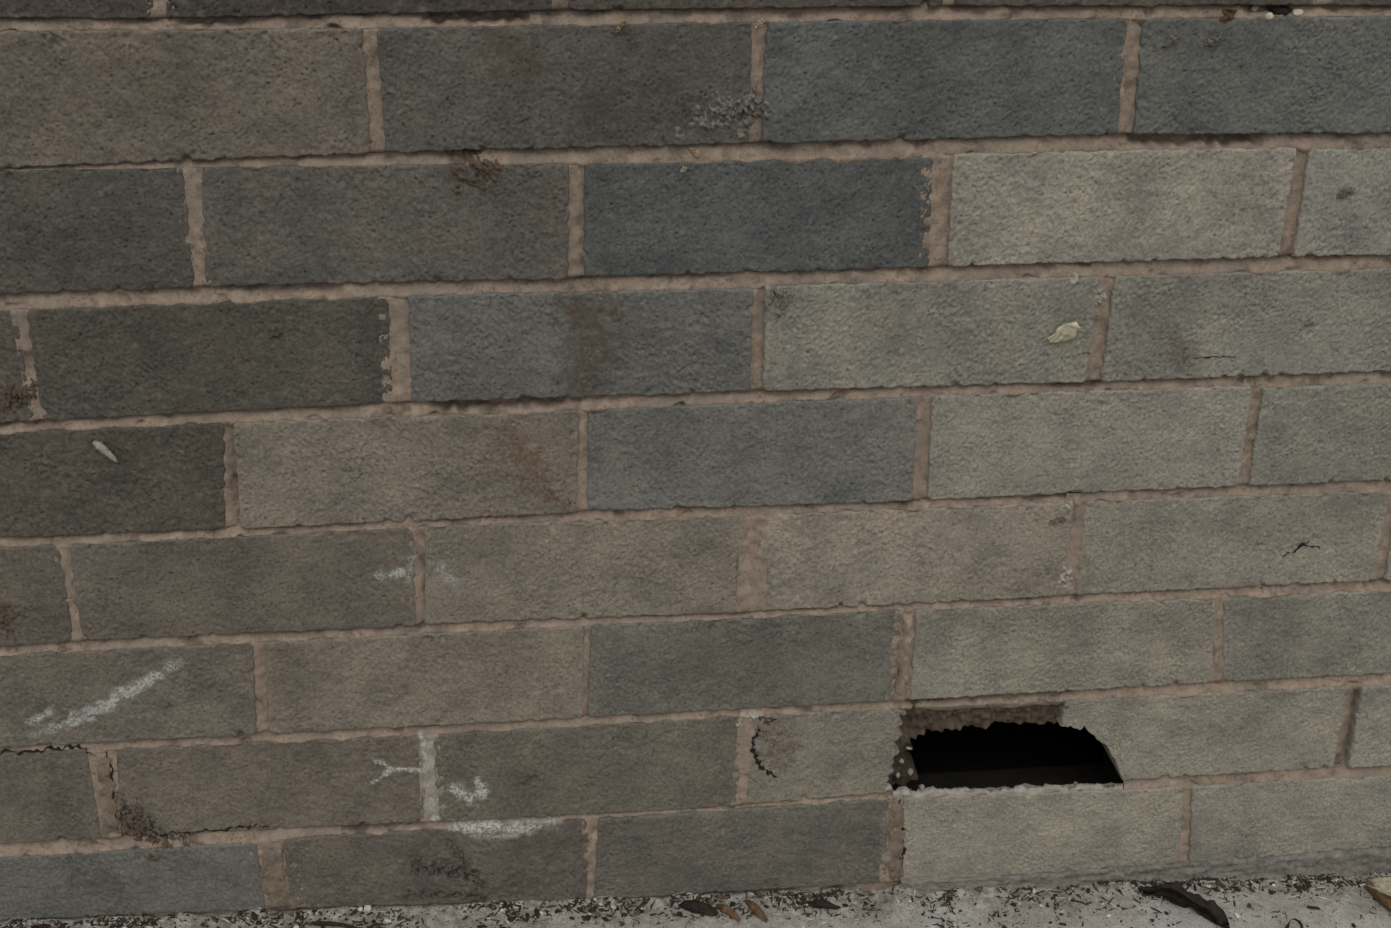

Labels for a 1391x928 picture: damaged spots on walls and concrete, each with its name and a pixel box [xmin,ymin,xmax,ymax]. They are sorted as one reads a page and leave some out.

spalling [887,721,1124,882]